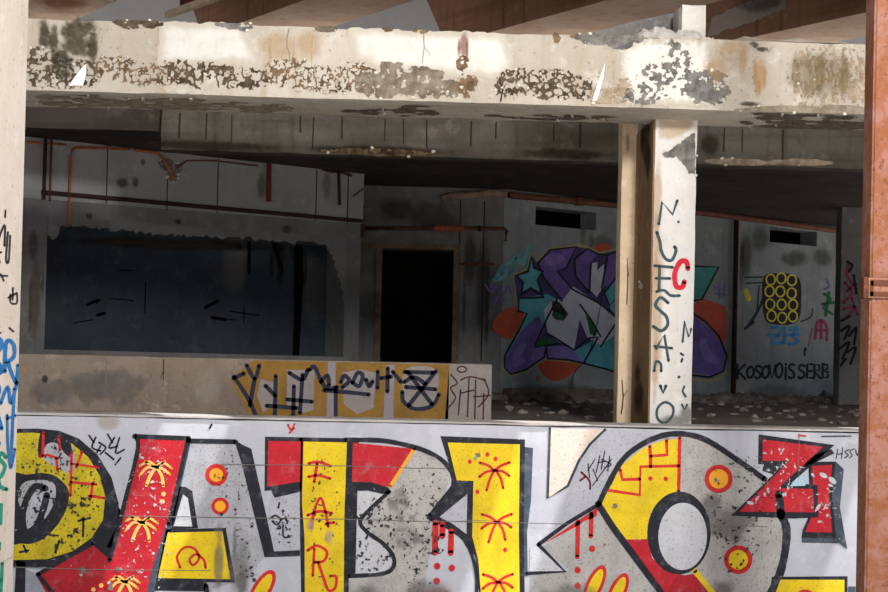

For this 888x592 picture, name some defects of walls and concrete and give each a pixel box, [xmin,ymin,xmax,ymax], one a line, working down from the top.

damp [39,18,97,79]
spalling [26,46,479,118]
peeling [734,44,865,130]
peeling [485,114,617,122]
spalling [662,133,832,176]
rust [870,280,888,297]